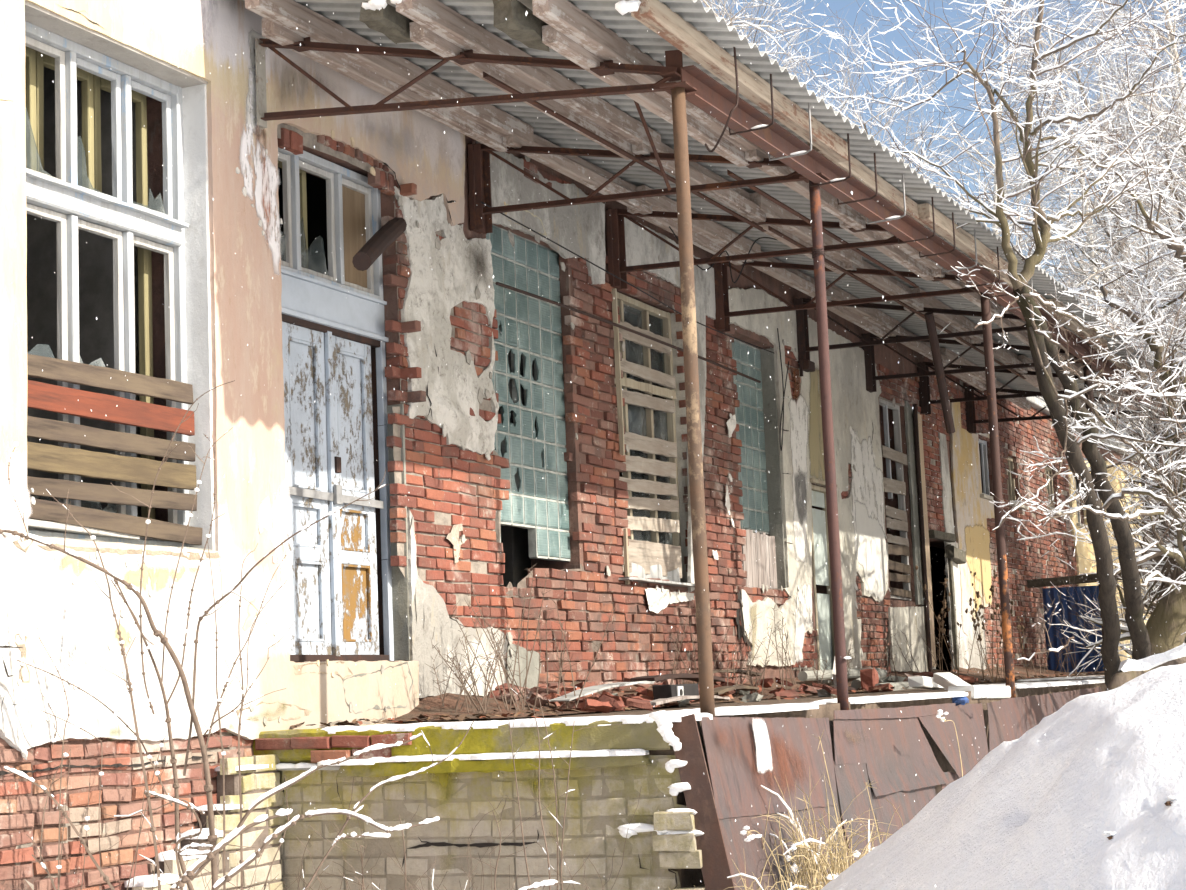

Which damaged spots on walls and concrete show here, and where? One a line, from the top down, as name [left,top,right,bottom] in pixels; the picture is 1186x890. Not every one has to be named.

peeling [236,30,403,272]
flaking render [490,154,589,195]
flaking render [383,230,698,690]
flaking render [703,316,818,684]
peeling [782,339,825,566]
peeling [841,426,891,673]
flaking render [875,363,1078,669]
flaking render [0,728,254,890]
flaking render [236,701,311,726]